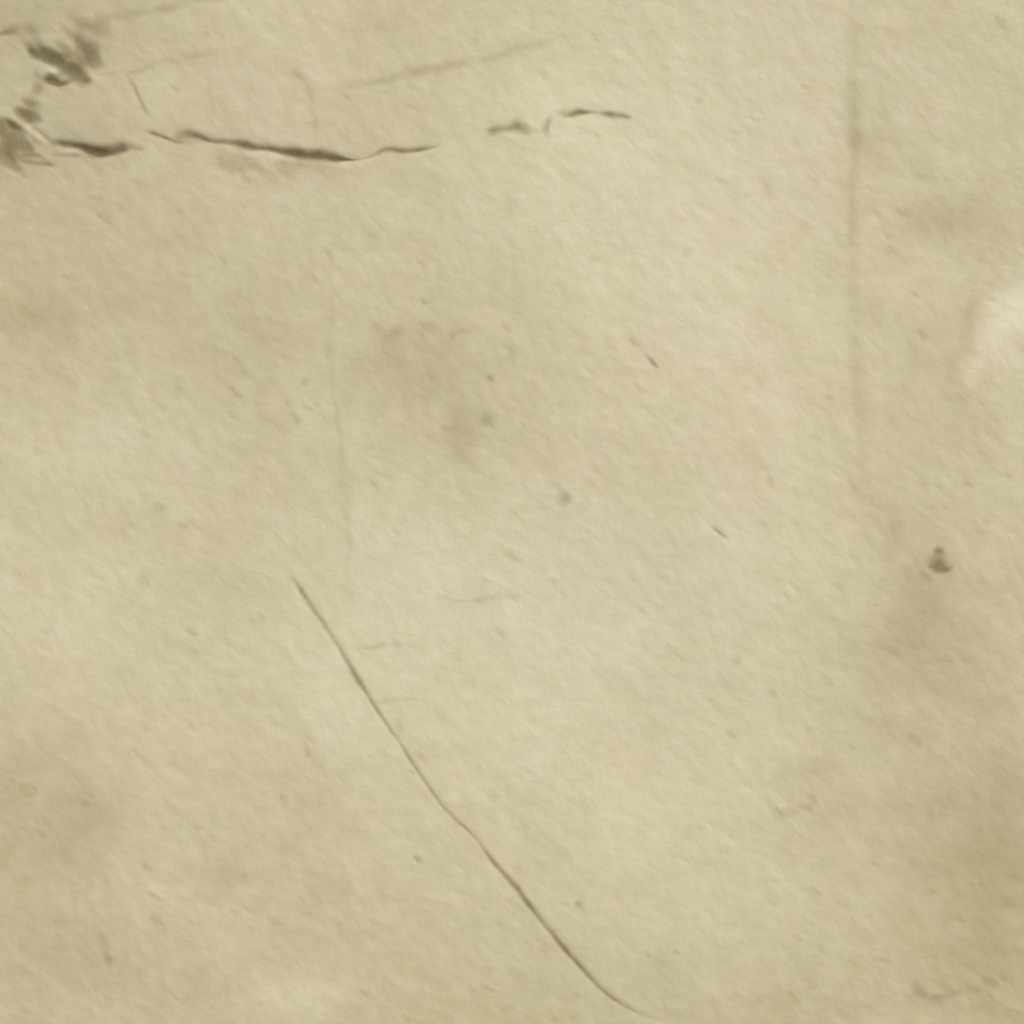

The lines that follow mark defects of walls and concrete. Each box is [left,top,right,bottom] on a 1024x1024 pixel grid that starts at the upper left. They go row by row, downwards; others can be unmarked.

spalling [41,49,79,86]
spalling [7,109,33,147]
crack [62,142,125,157]
crack [236,142,353,161]